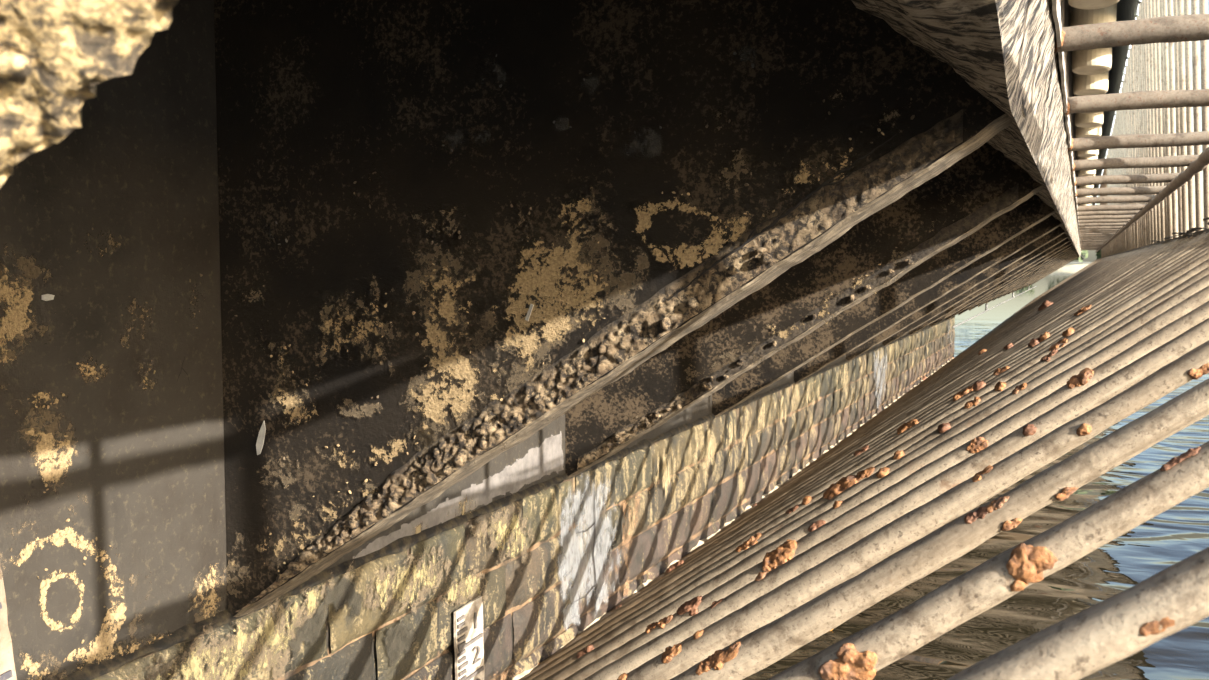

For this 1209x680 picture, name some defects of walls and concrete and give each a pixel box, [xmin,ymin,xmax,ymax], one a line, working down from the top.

spalling [0,0,179,187]